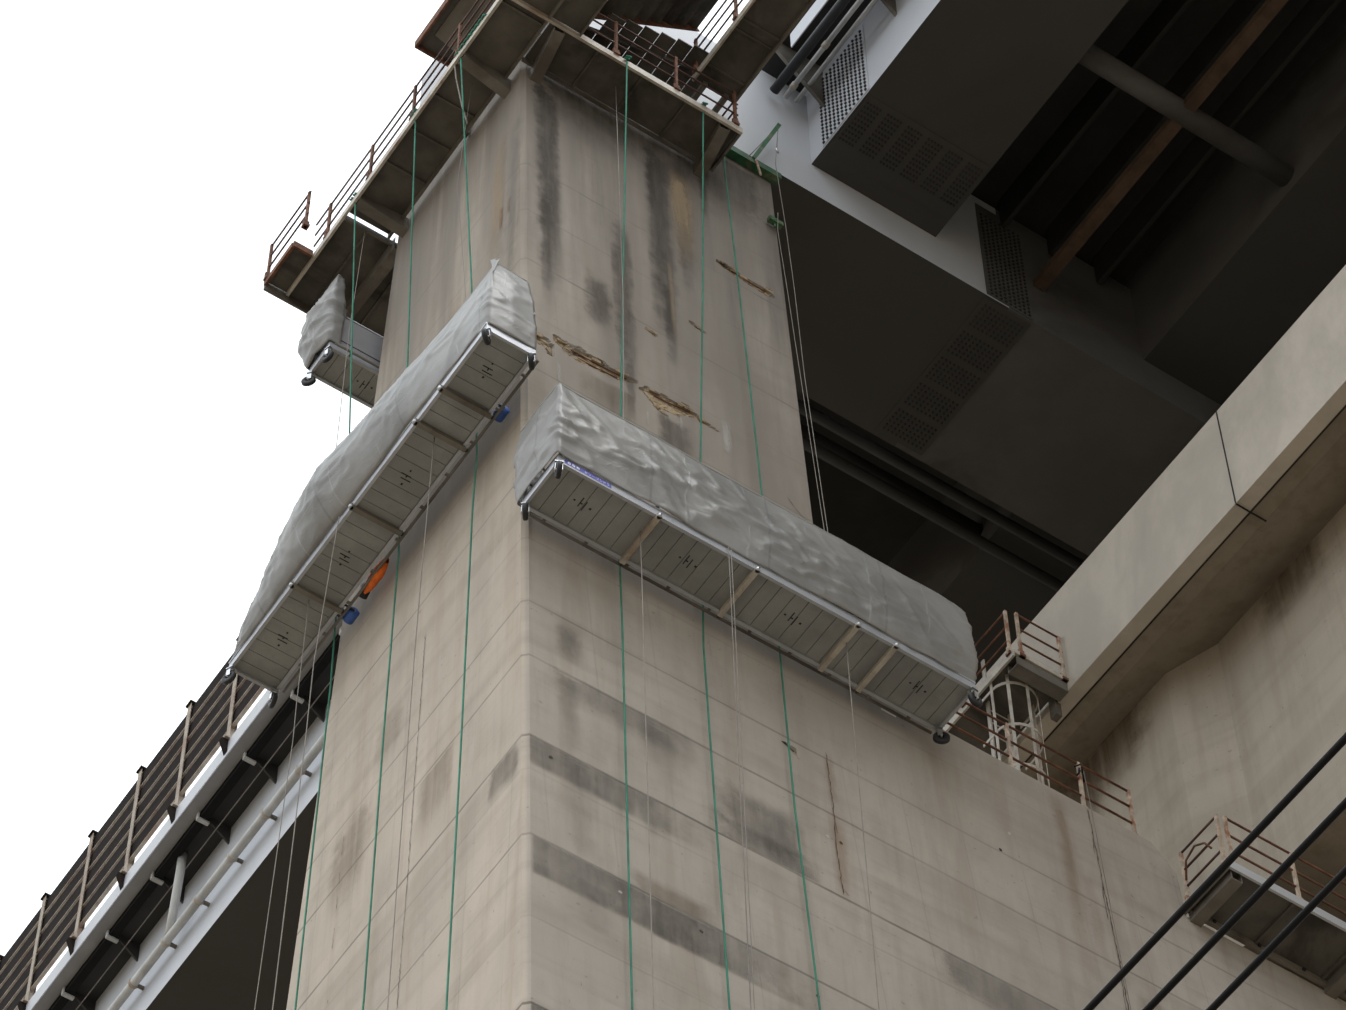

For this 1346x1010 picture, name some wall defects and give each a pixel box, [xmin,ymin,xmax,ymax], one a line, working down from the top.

damp [537,75,752,345]
spalling [718,260,774,297]
spalling [537,332,712,429]